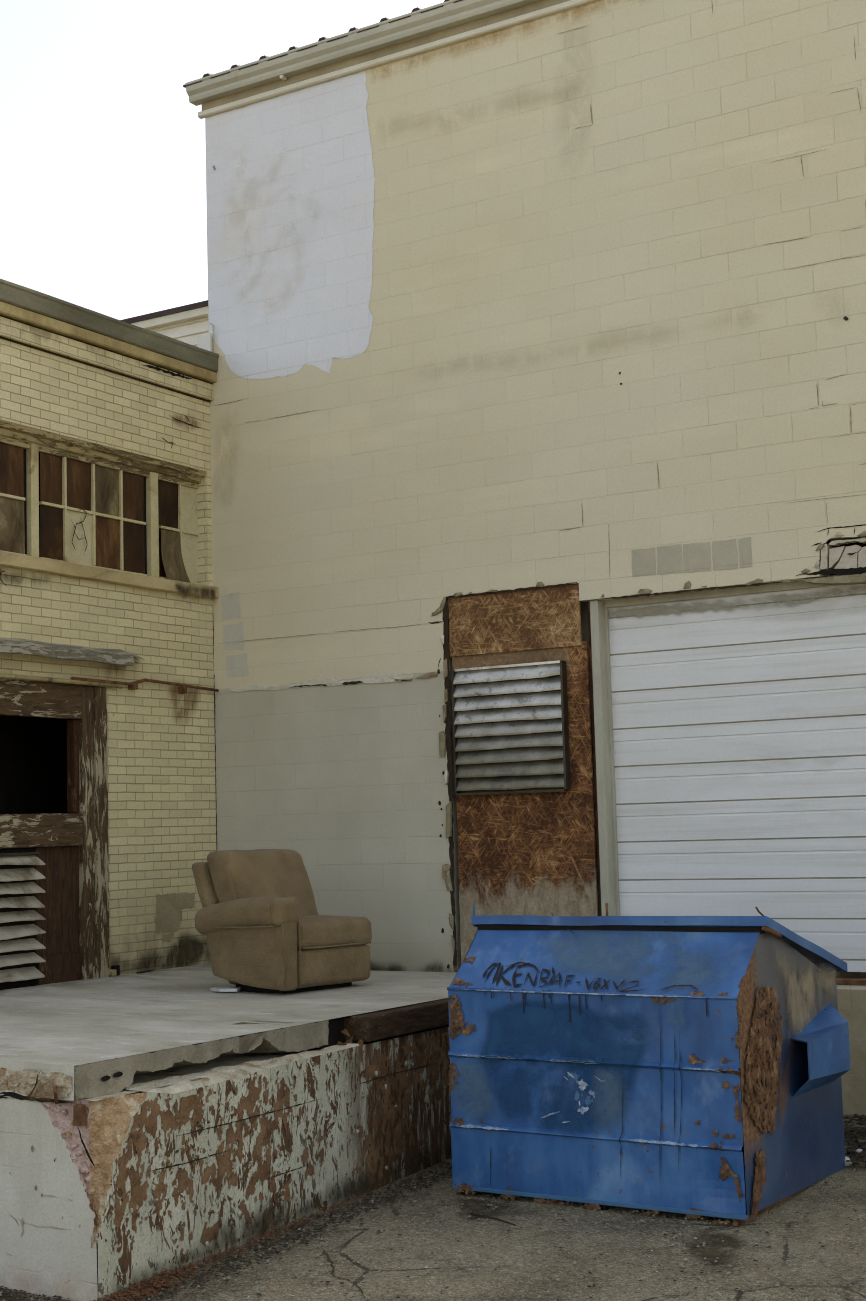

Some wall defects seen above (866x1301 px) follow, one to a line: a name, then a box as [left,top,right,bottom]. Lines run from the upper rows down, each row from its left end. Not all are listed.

crack [763,199,866,269]
crack [790,374,866,522]
spalling [587,524,866,601]
spalling [230,582,577,972]
peeling [385,1032,451,1125]
spalling [0,1068,335,1263]